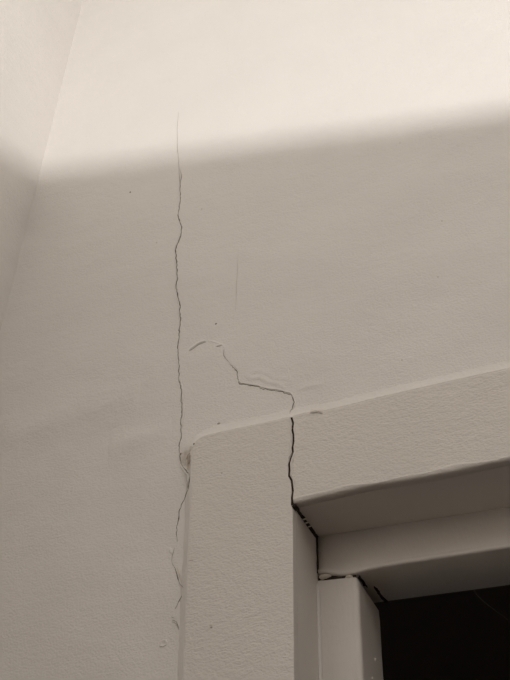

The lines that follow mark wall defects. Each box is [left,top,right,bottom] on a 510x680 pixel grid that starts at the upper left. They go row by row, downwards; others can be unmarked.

crack [169,144,190,629]
crack [223,352,388,603]